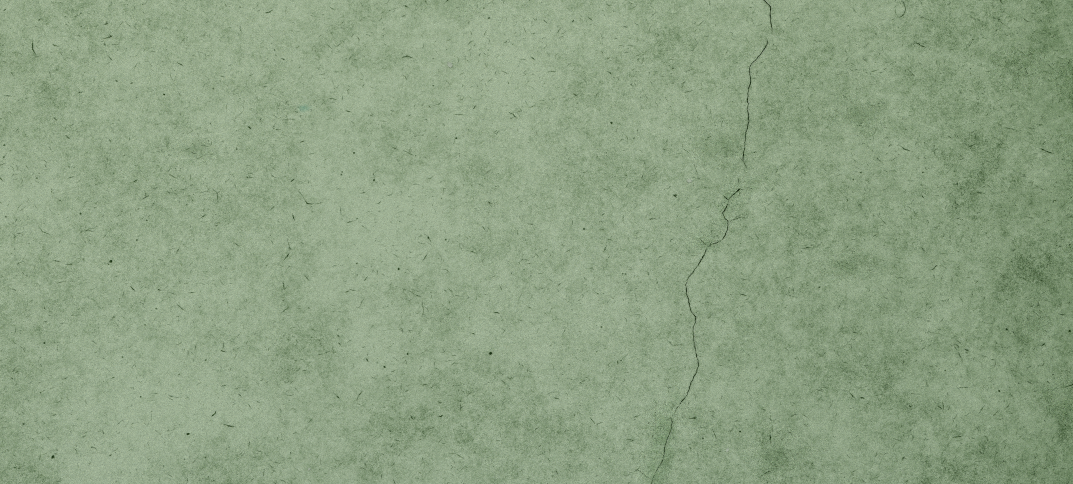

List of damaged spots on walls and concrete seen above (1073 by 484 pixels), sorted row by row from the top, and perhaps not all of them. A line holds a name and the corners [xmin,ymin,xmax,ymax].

crack [661,0,772,463]